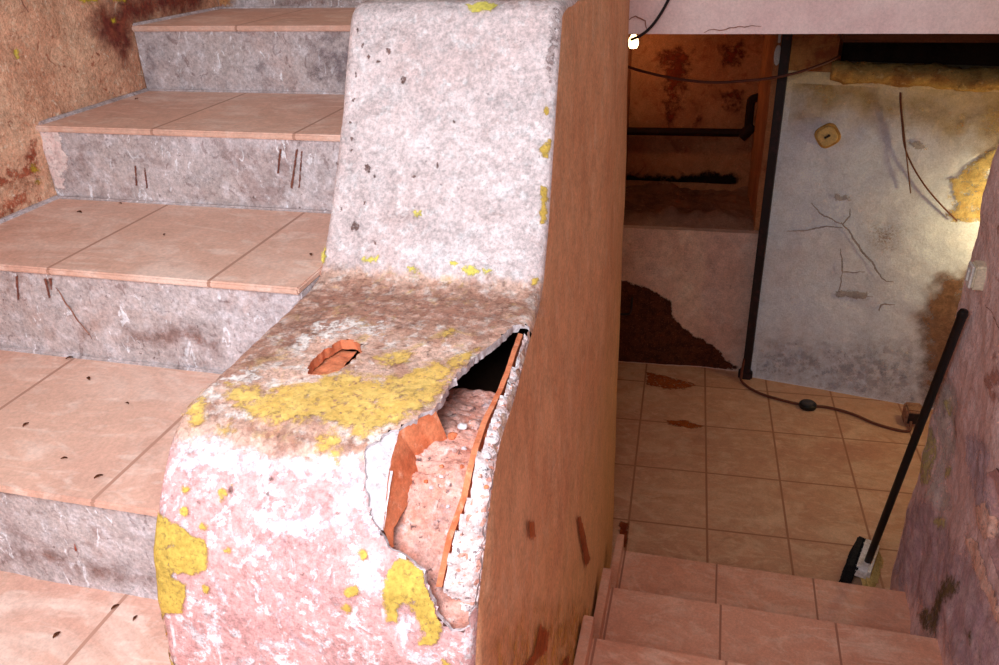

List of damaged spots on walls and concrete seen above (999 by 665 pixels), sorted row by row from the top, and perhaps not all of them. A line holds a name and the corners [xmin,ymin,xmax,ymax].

water stain [658,46,690,124]
crack [788,203,895,311]
spalling [178,317,531,633]
corrosion [646,372,695,390]
spalling [618,281,737,370]
corrosion [667,420,703,428]
peeling [924,380,957,511]
water stain [919,272,966,416]
peeling [965,468,999,624]
peeling [183,601,226,654]
peeling [257,640,289,651]
peeling [394,614,445,665]